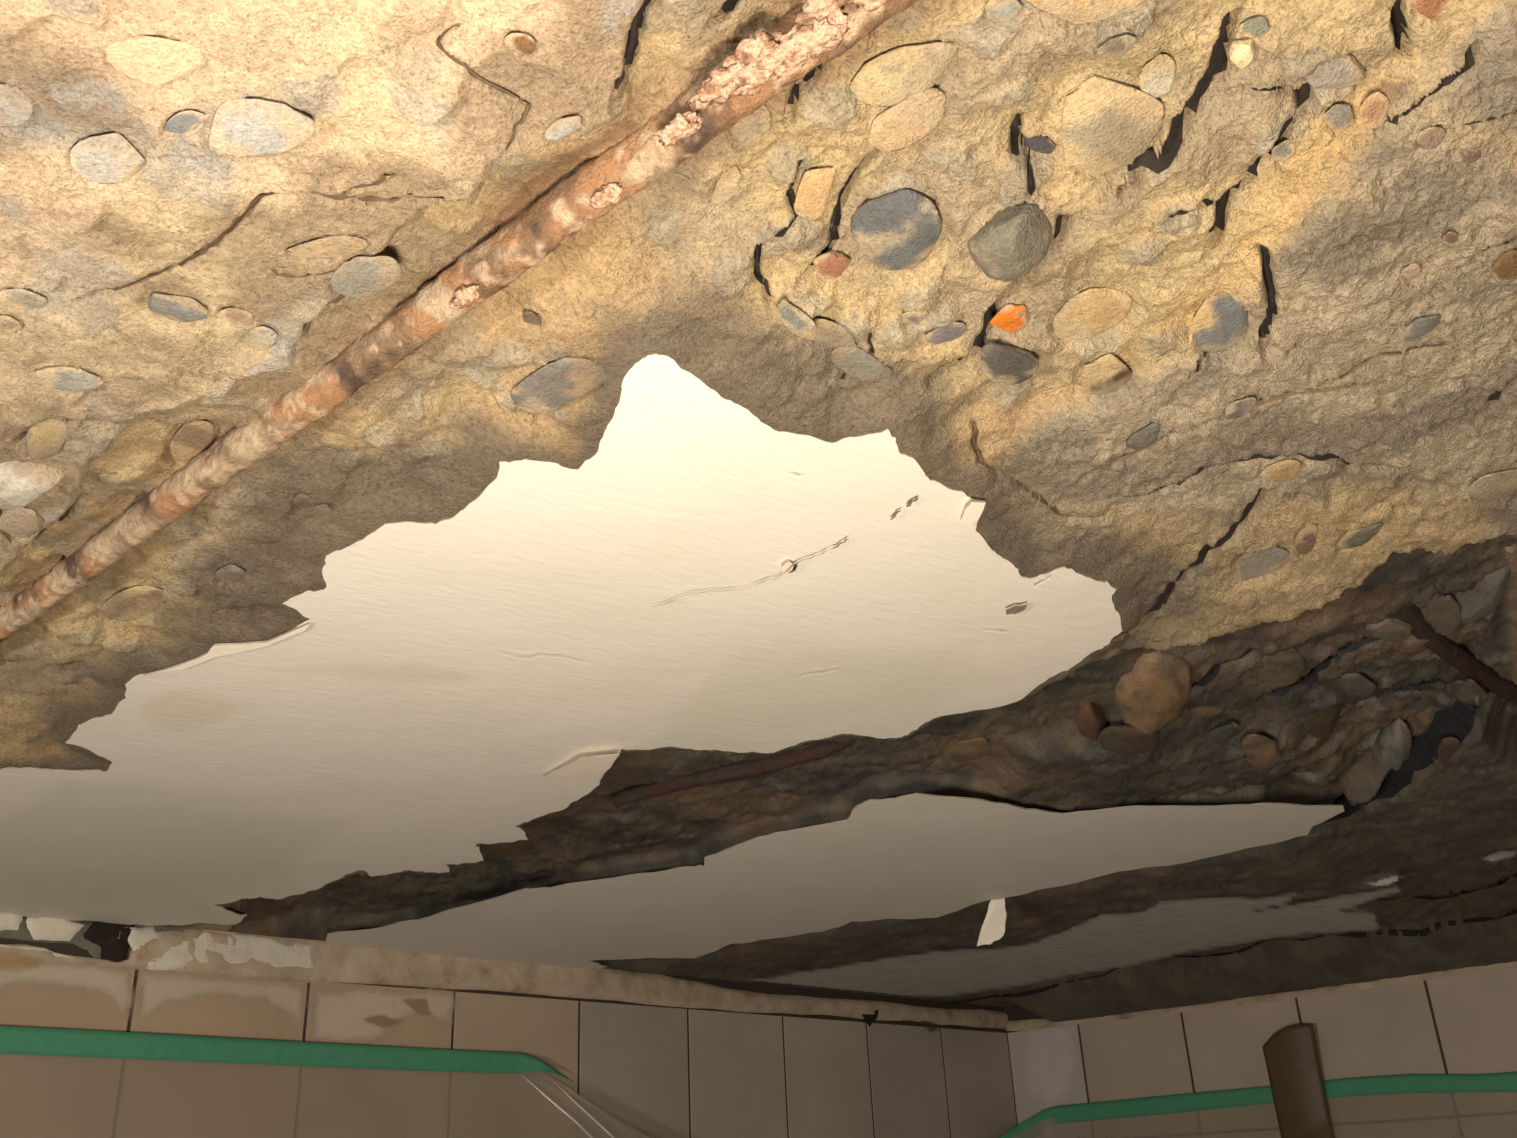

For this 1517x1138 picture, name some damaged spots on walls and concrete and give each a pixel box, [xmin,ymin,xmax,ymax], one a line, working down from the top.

crack [76,192,277,299]
crack [436,25,530,151]
crack [614,0,651,90]
crack [787,63,823,104]
crack [753,157,865,296]
crack [957,279,1014,361]
crack [1010,113,1063,239]
crack [1128,12,1310,233]
crack [1259,244,1277,338]
spalling [0,0,1517,772]
spalling [0,635,1154,970]
spalling [594,536,1517,1022]